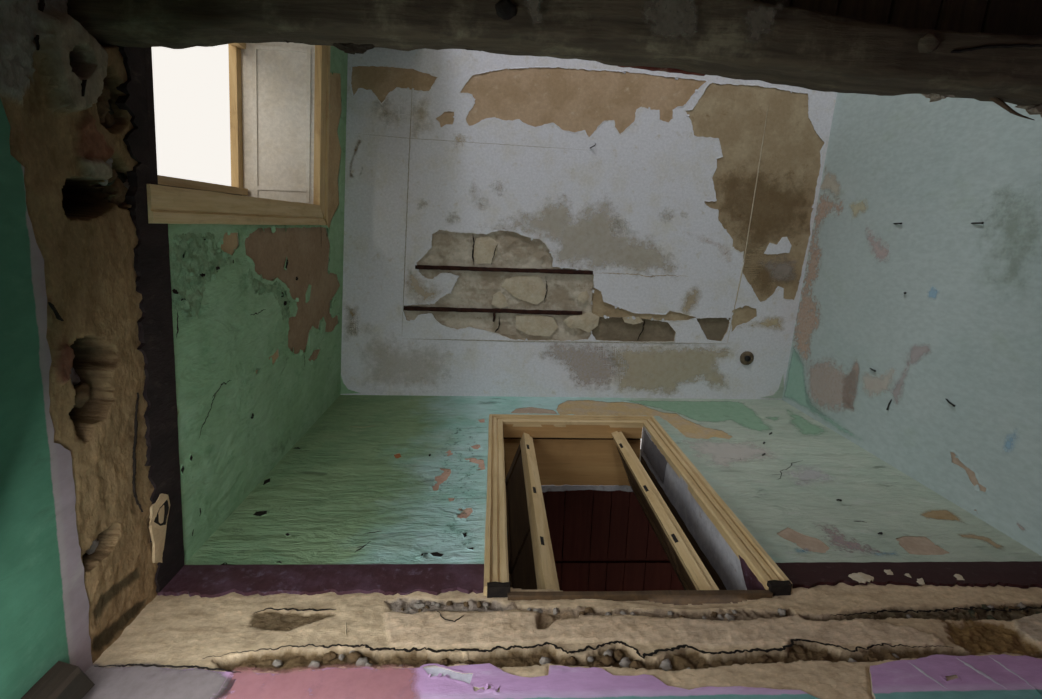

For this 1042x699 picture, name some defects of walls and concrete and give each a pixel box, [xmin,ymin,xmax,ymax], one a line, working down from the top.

crack [951,44,1042,53]
flaking render [350,64,439,105]
flaking render [401,66,826,343]
peeling [216,225,340,357]
flaking render [0,0,170,663]
peeling [509,400,734,440]
peeling [643,430,667,483]
peeling [429,430,487,551]
crack [95,607,948,673]
flaking render [93,578,1042,699]
spalling [849,572,874,583]
crack [831,605,1042,616]